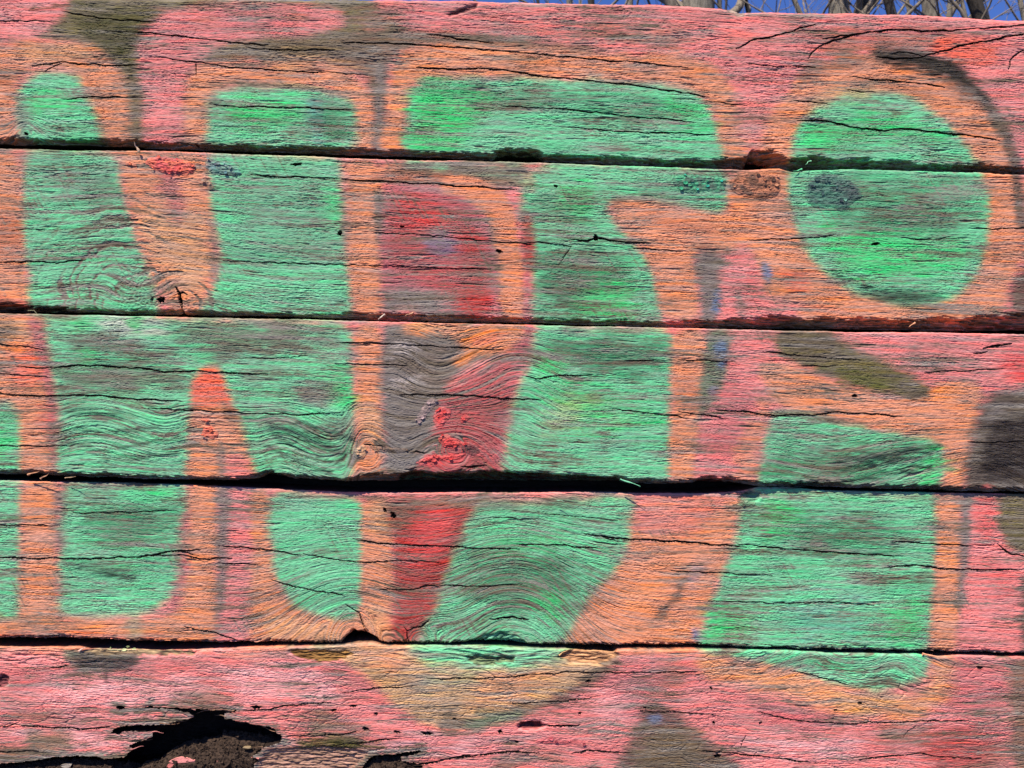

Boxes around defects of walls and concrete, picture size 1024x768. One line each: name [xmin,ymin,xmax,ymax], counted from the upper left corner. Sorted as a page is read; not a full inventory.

crack [0,11,747,106]
crack [736,24,1024,93]
crack [0,514,1024,631]